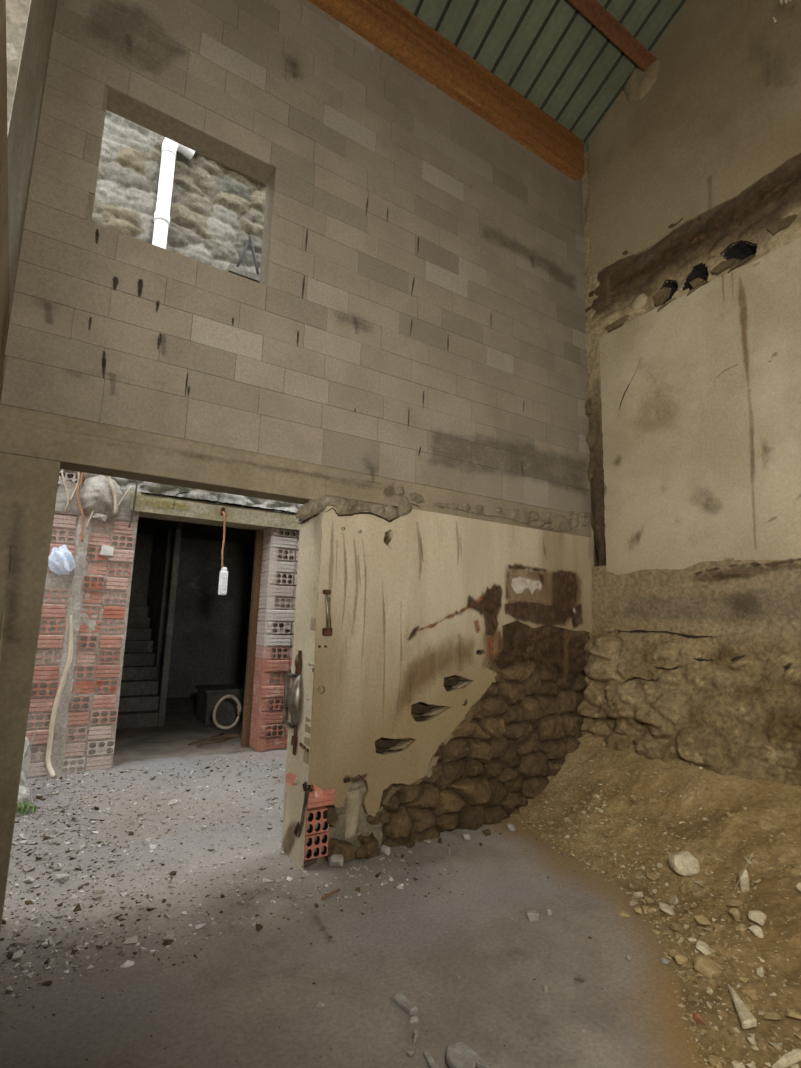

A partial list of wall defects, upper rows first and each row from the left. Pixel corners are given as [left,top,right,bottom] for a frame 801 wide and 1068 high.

spalling [582,151,801,566]
spalling [281,621,590,869]